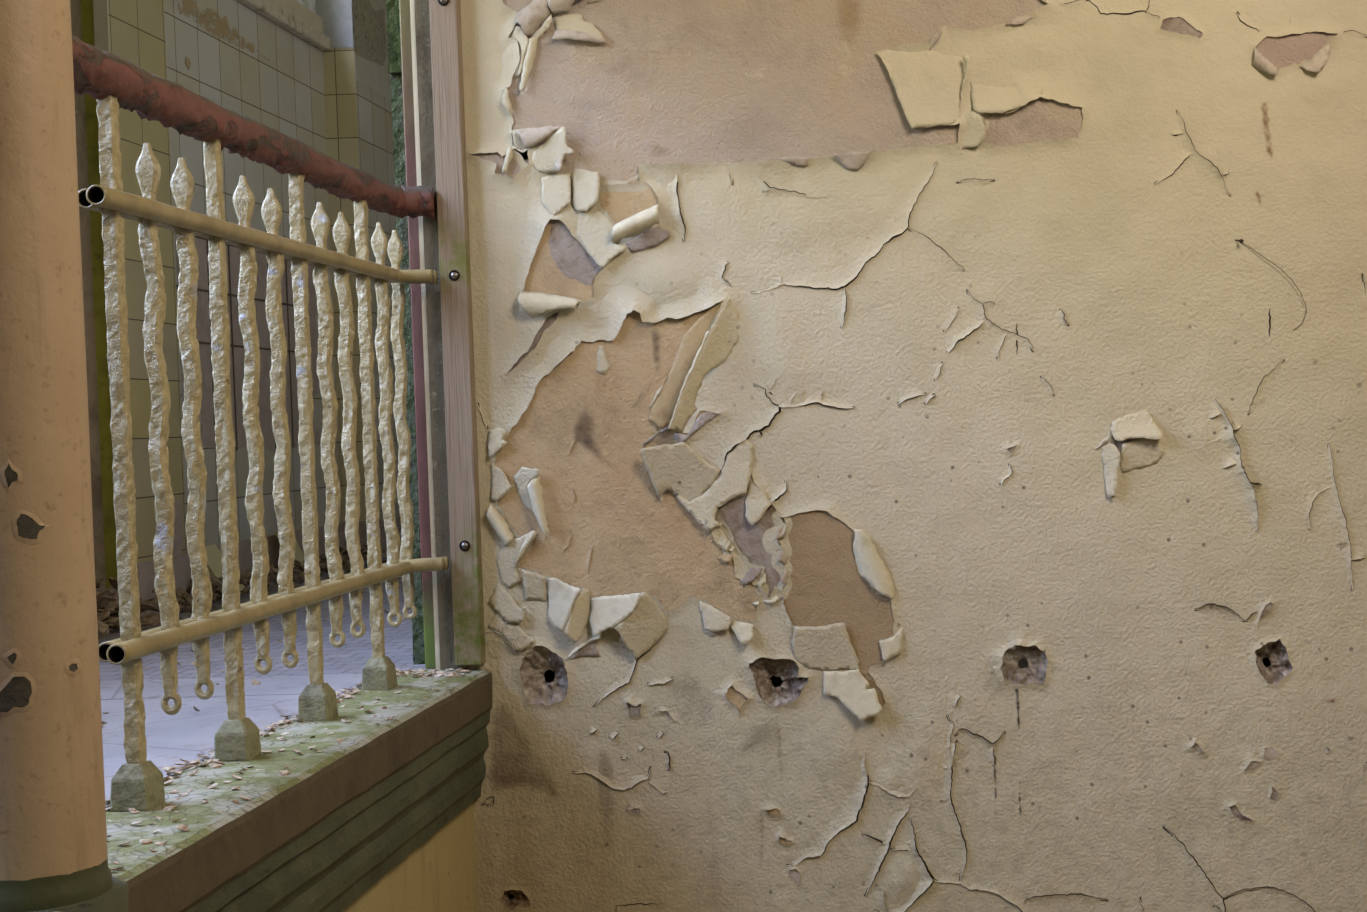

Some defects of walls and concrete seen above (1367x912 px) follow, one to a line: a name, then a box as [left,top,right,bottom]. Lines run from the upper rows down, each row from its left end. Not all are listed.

peeling [1242,15,1348,83]
crack [1154,109,1231,197]
peeling [466,0,1098,722]
peeling [1095,410,1164,498]
crack [1196,310,1285,531]
crack [1295,443,1366,591]
peeling [0,648,37,717]
peeling [588,676,681,771]
crack [1195,603,1258,623]
spalling [1247,596,1298,692]
crack [786,693,1150,912]
crack [1162,826,1315,912]